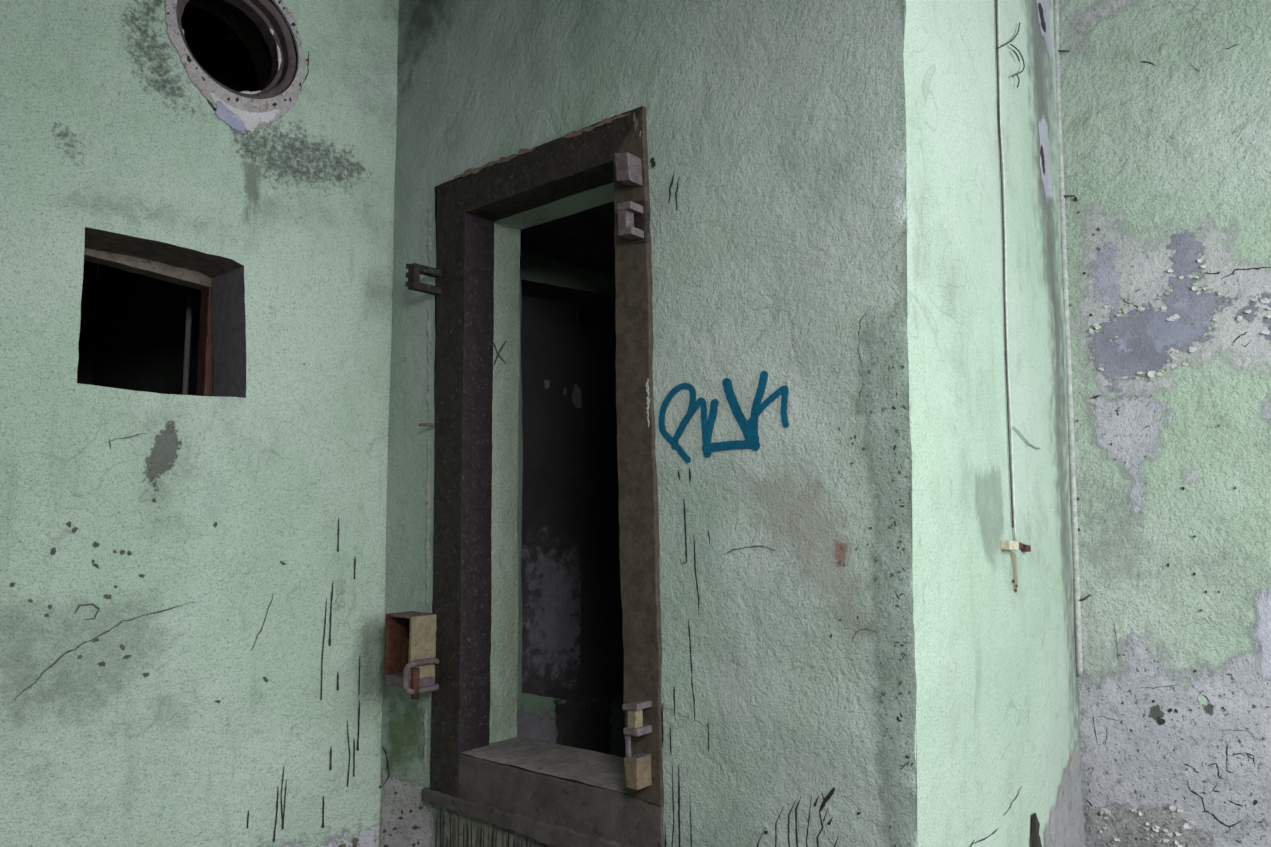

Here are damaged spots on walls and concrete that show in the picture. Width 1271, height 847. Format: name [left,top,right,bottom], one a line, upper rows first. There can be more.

peeling [1067,202,1271,515]
spalling [856,297,916,847]
flaking render [282,769,433,847]
crack [970,786,1023,847]
flaking render [1030,589,1271,847]